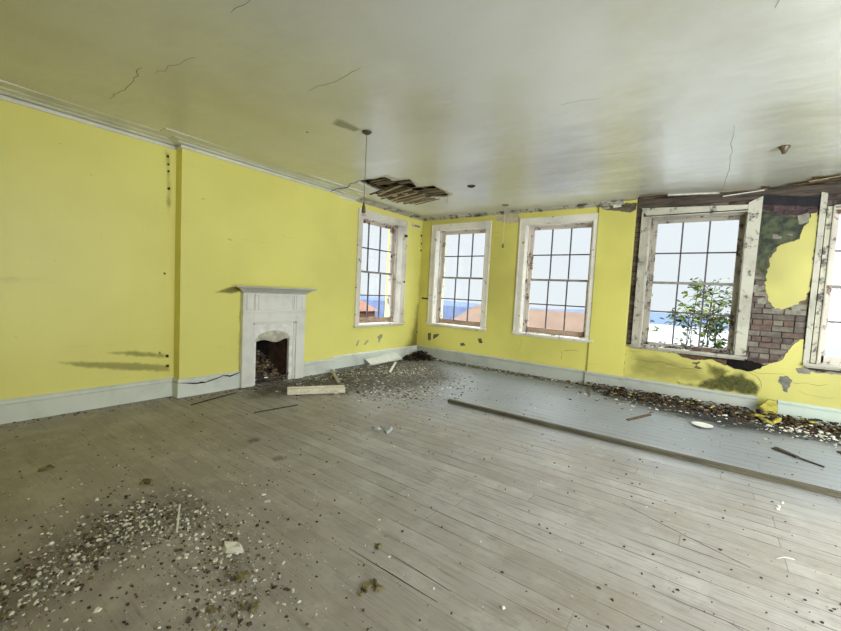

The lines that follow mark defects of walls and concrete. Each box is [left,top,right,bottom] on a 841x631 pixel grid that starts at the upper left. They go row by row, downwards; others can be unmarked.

spalling [762,205,818,224]
leakage [756,212,805,276]
spalling [677,269,809,372]
leakage [699,367,758,394]
spalling [778,376,792,392]